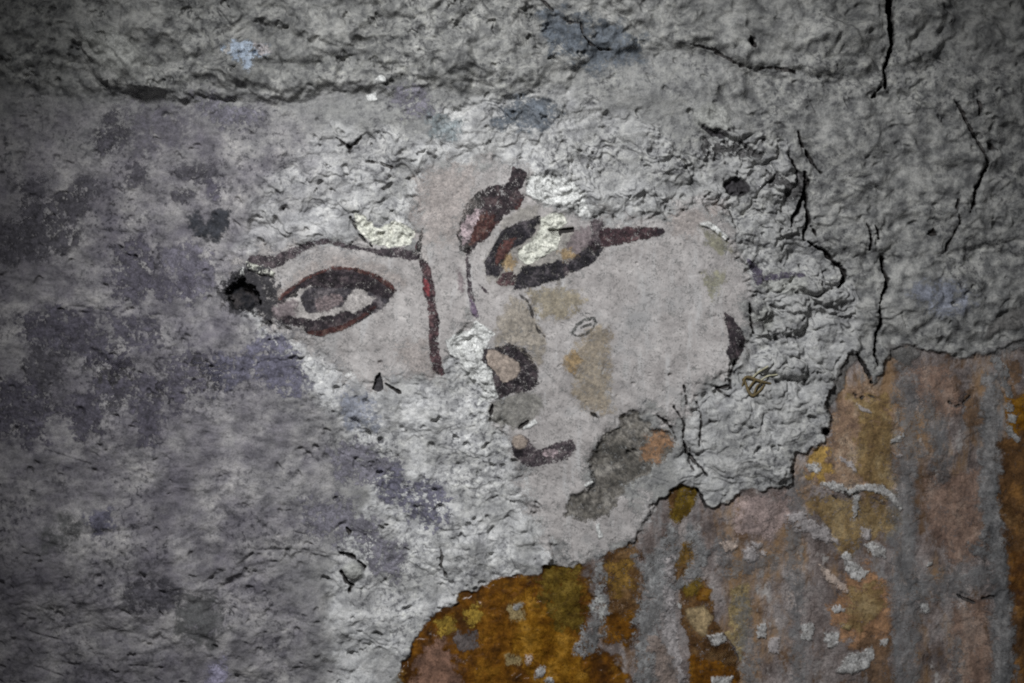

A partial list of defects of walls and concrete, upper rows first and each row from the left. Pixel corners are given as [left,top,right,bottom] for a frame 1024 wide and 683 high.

crack [871,0,894,99]
crack [788,131,847,288]
crack [945,100,997,252]
crack [747,304,755,334]
crack [854,224,889,400]
crack [657,361,735,508]
spalling [565,340,1024,683]